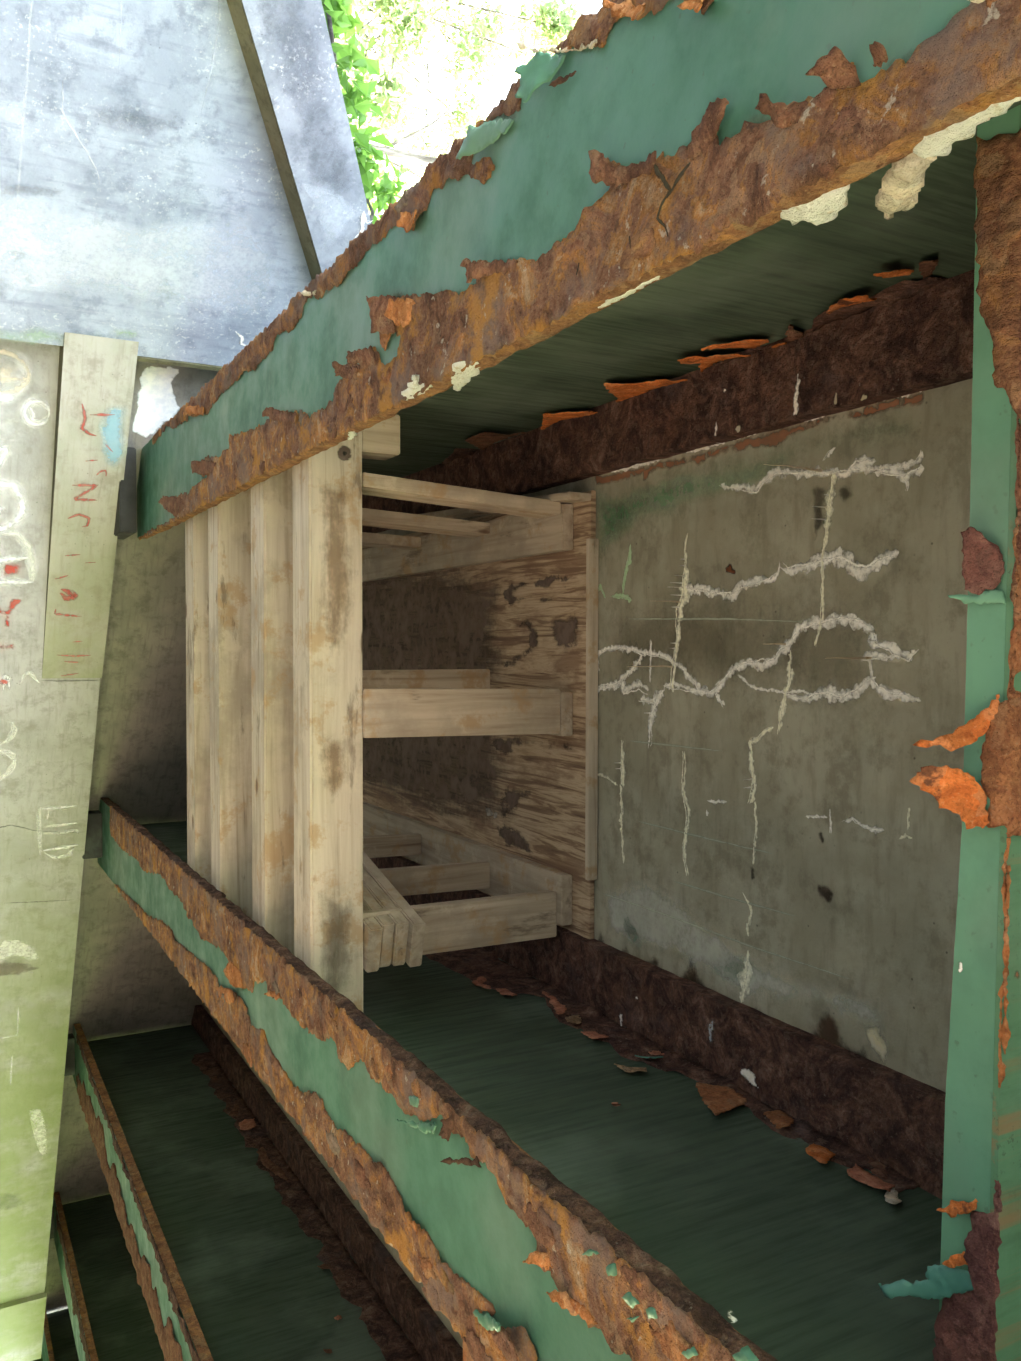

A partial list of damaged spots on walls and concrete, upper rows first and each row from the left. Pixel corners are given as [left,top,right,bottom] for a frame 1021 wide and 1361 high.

rust [139,0,1021,540]
rust [909,128,1021,1088]
rust [818,887,832,901]
rust [76,1034,201,1361]
rust [101,797,778,1361]
rust [425,947,919,1204]
rust [878,1180,1003,1361]